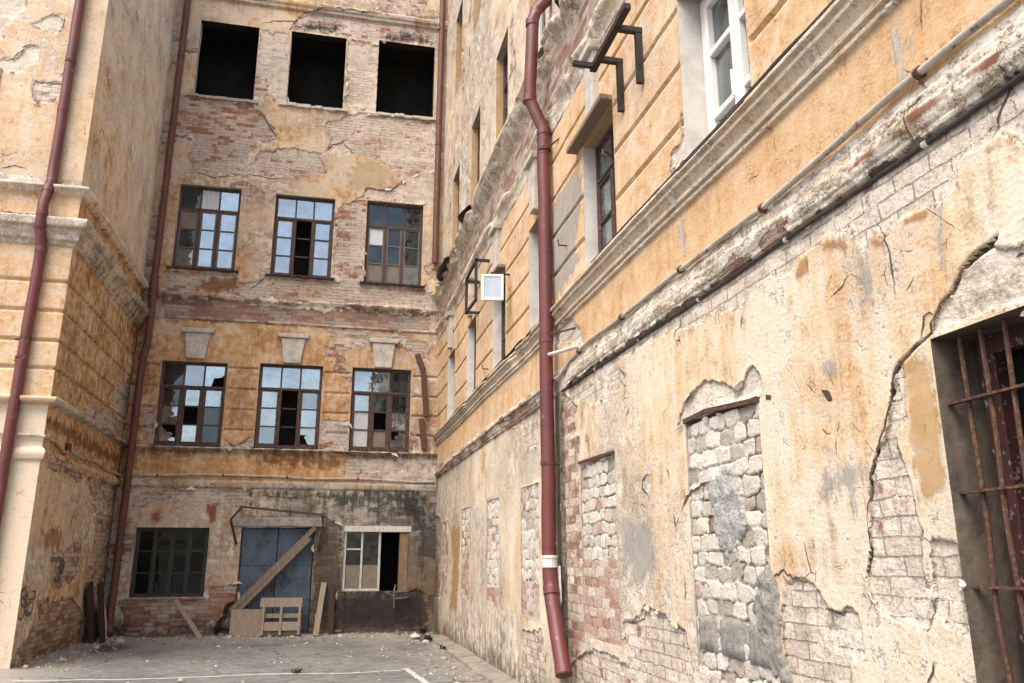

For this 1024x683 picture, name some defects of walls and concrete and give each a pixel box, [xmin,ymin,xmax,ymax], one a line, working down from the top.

spalling [0,42,43,75]
spalling [27,79,73,107]
spalling [160,7,439,362]
crack [877,223,896,301]
spalling [560,59,1024,683]
crack [866,236,1024,580]
spalling [15,451,121,663]
damp [318,487,428,580]